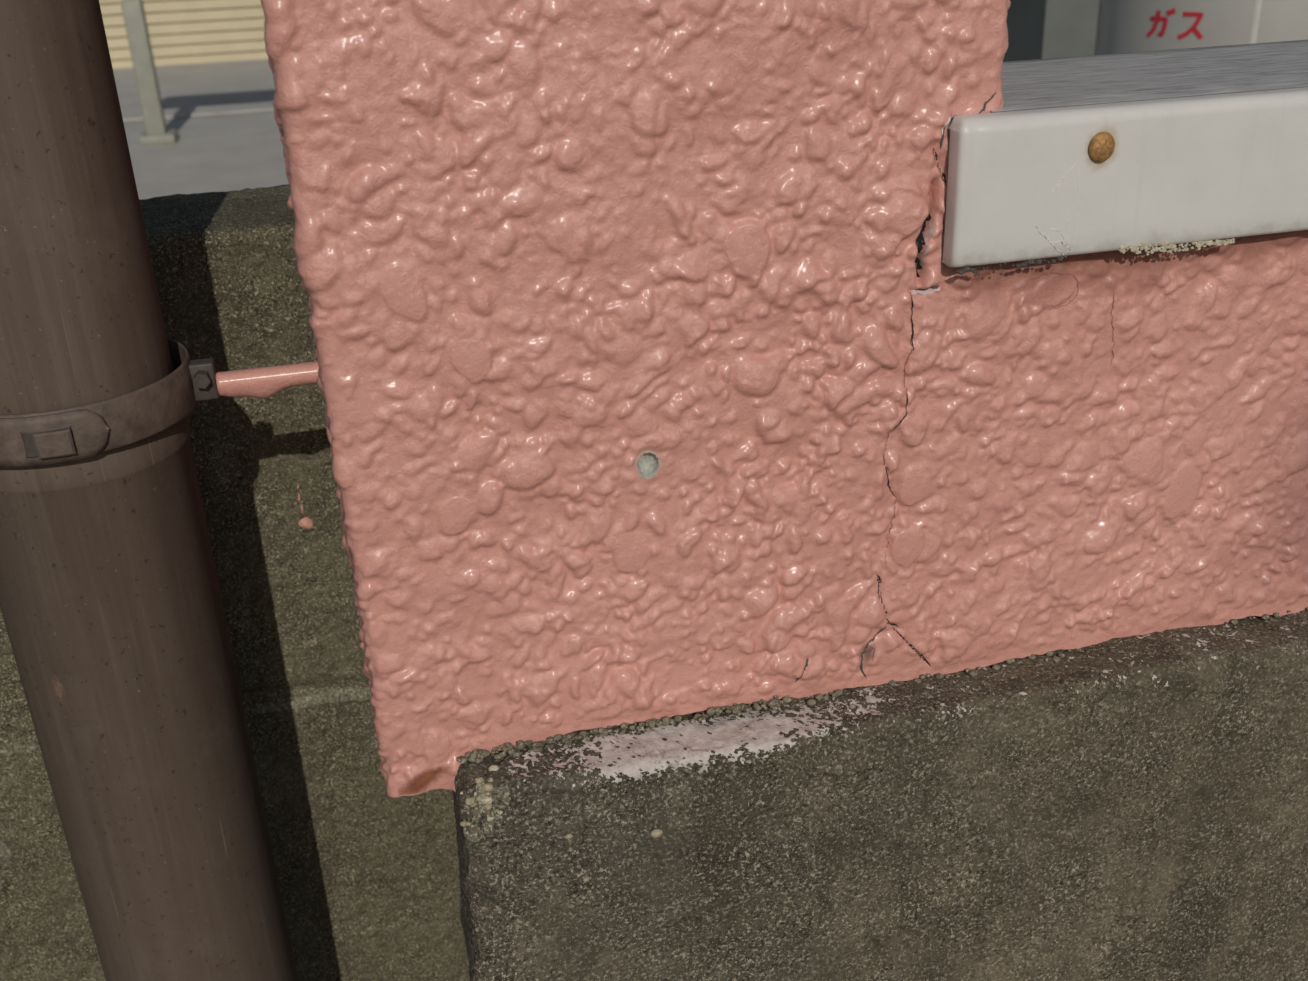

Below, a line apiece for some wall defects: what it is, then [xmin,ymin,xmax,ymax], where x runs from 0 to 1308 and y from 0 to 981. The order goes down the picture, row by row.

crack [859,92,996,679]